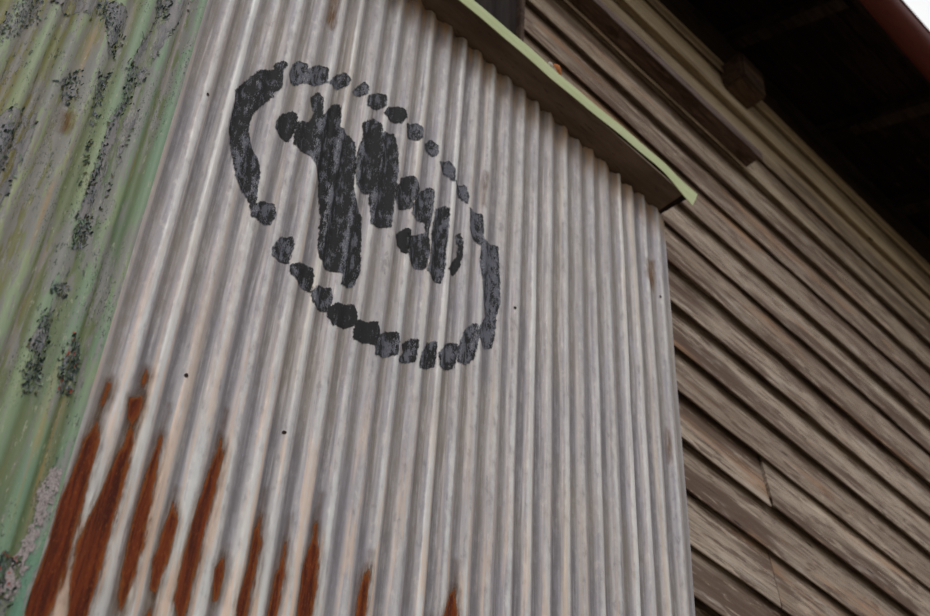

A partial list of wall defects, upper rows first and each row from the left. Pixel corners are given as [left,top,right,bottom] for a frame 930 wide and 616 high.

peeling [0,0,128,59]
peeling [0,106,39,204]
peeling [52,69,84,106]
peeling [70,0,193,251]
peeling [19,308,55,397]
peeling [57,332,83,397]
corrosion [25,369,148,616]
corrosion [118,436,163,611]
corrosion [150,503,179,595]
corrosion [173,439,225,616]
corrosion [236,518,263,616]
corrosion [297,523,319,616]